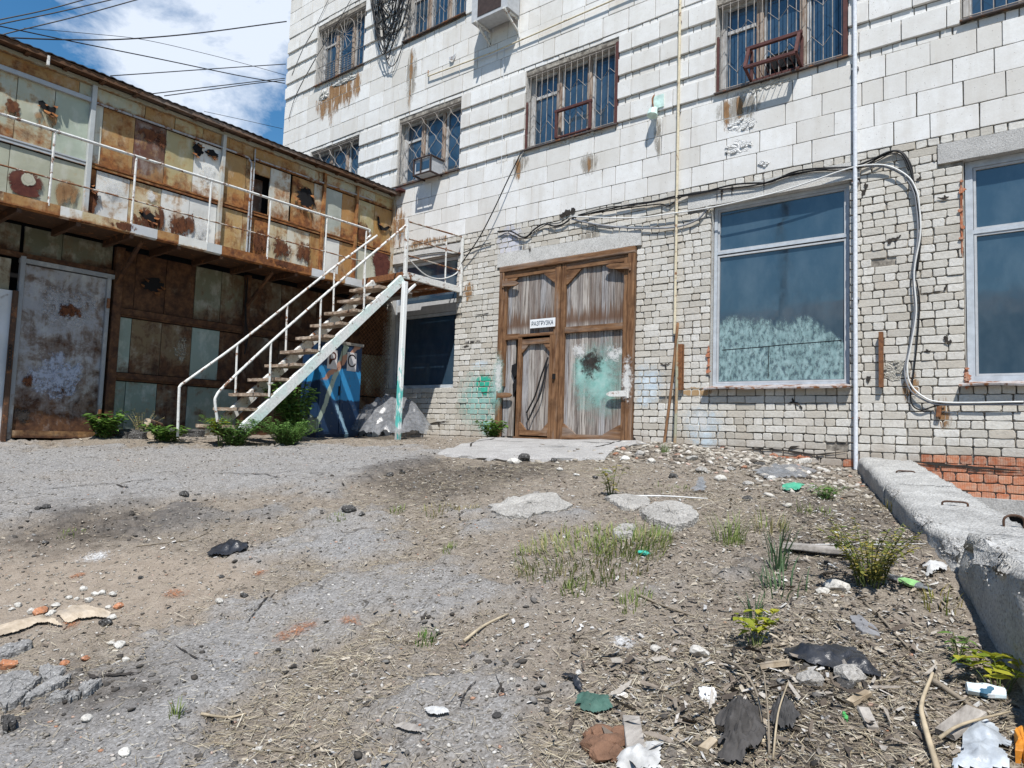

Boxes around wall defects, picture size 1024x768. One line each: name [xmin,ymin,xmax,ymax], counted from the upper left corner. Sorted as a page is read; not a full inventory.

corrosion [316,72,361,125]
corrosion [407,50,417,114]
corrosion [110,206,195,237]
corrosion [251,230,310,271]
corrosion [55,303,82,318]